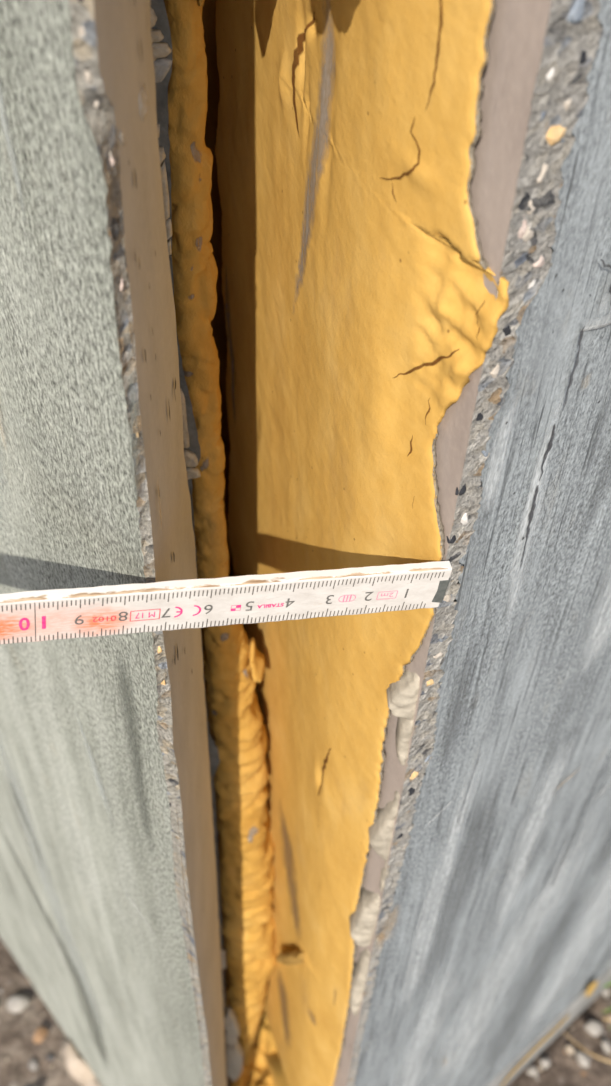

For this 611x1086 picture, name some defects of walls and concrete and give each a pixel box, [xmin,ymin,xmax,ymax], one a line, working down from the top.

crack [292,12,315,134]
crack [383,0,443,202]
crack [394,301,485,378]